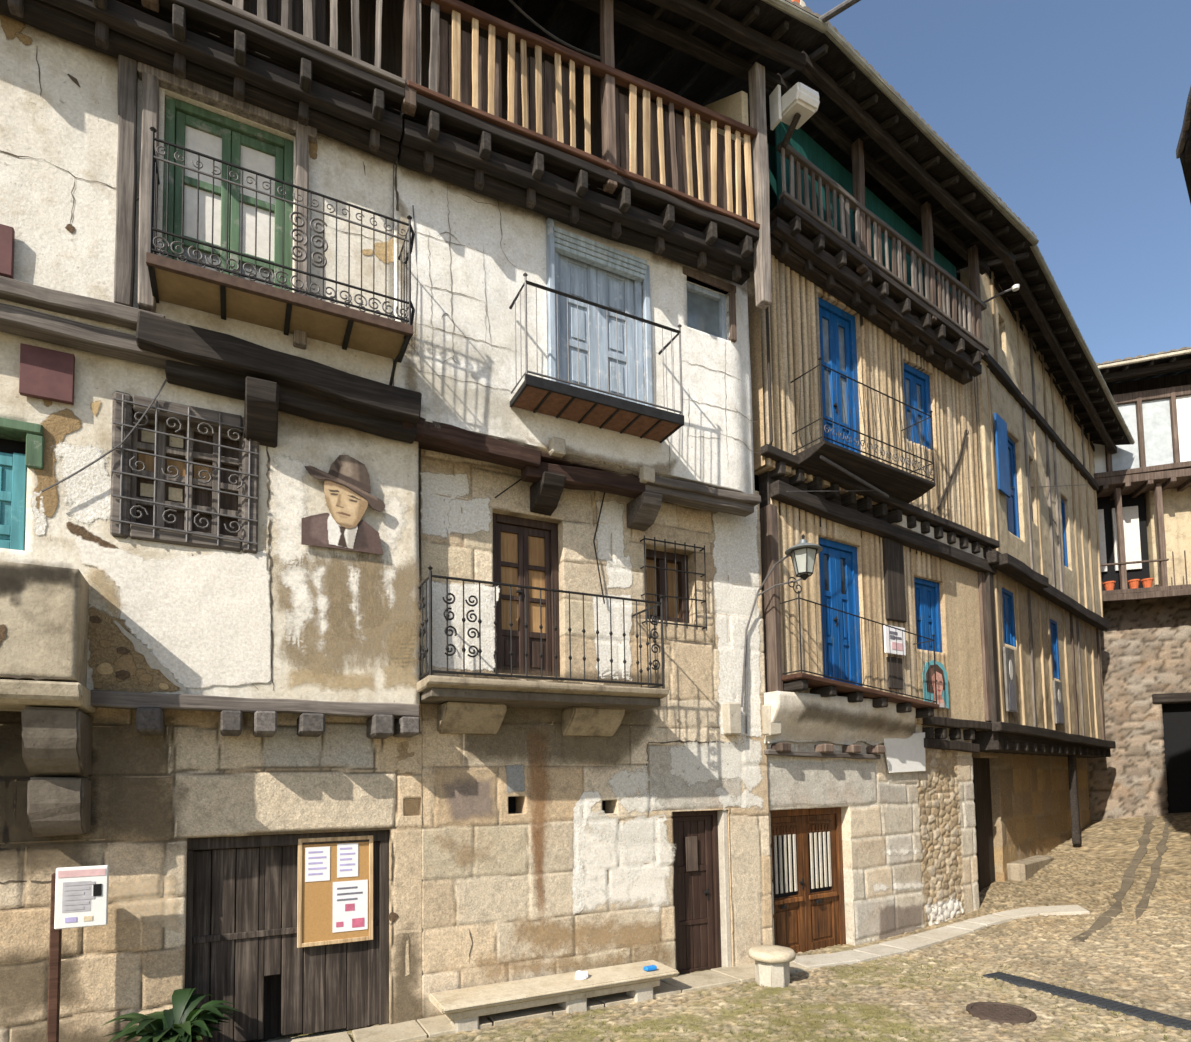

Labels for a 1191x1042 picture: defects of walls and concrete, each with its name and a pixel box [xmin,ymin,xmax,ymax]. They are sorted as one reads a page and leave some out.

crack [0,150,139,224]
flaking render [362,238,394,263]
flaking render [33,400,101,517]
spalling [66,522,118,549]
water stain [0,563,72,600]
spalling [88,570,188,693]
water stain [274,553,422,689]
peeling [742,735,764,767]
peeling [714,787,764,811]